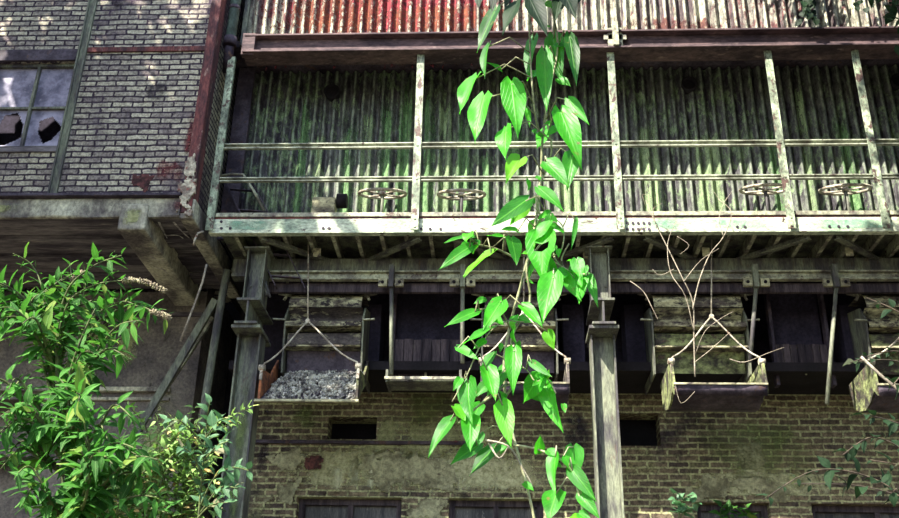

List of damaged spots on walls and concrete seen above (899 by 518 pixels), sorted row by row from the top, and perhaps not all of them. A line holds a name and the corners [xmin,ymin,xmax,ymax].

rust [260,0,533,34]
rust [602,17,736,29]
rust [184,114,193,152]
spalling [176,153,197,217]
flaking render [263,447,324,505]